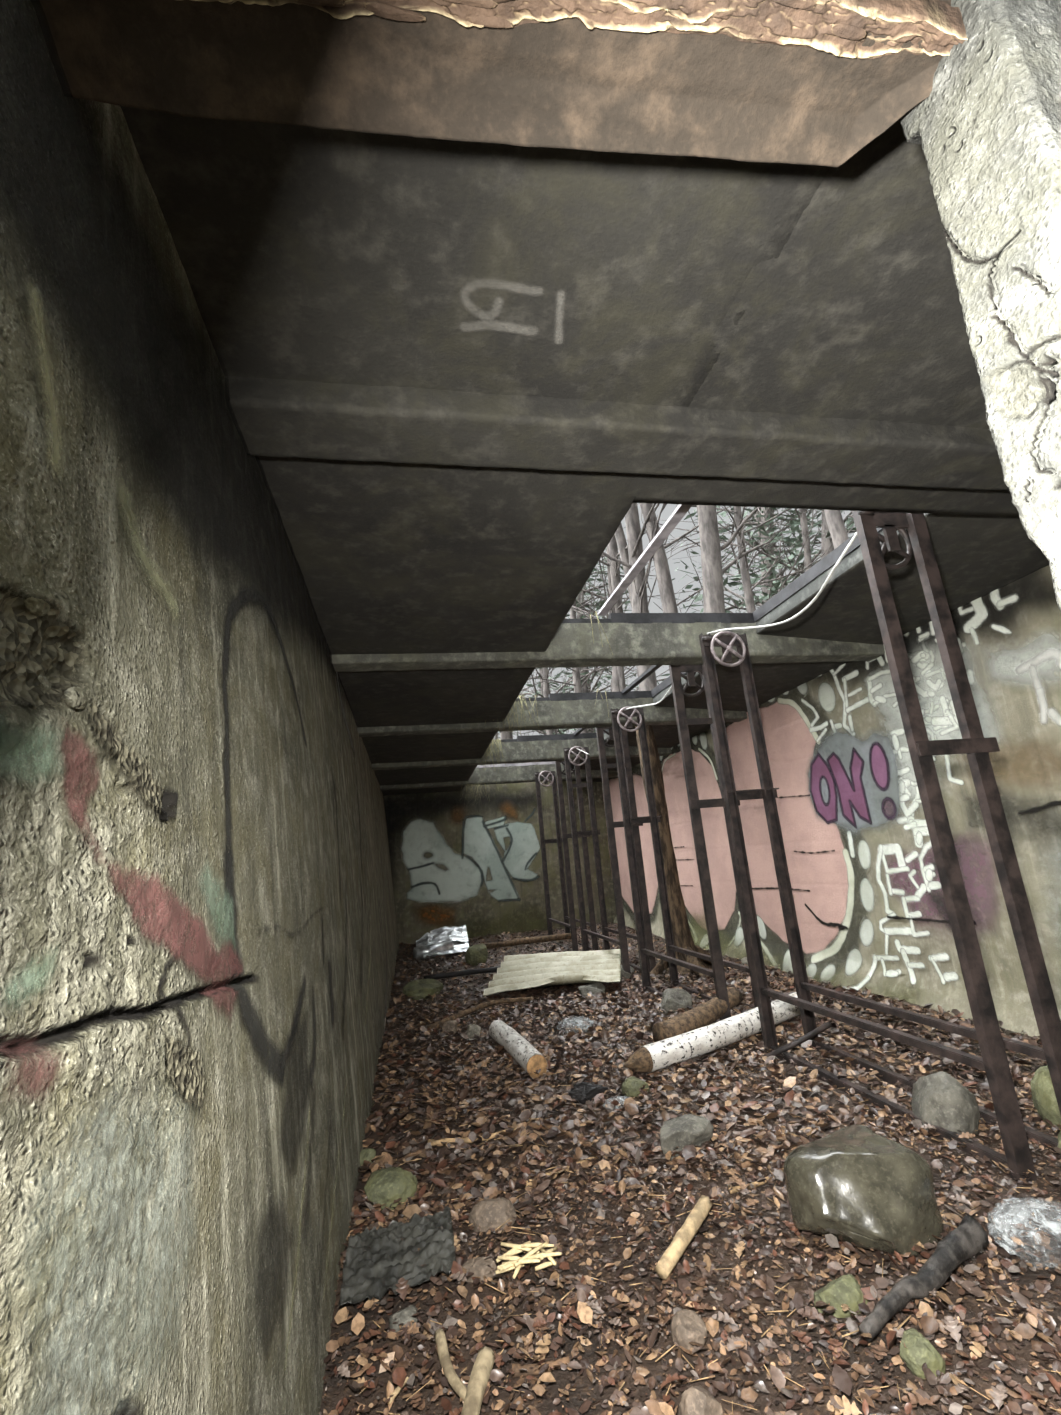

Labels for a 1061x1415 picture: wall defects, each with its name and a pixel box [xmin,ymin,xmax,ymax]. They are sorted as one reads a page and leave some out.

spalling [192,0,968,59]
crack [943,228,1061,502]
spalling [0,587,179,821]
crack [0,953,258,1054]